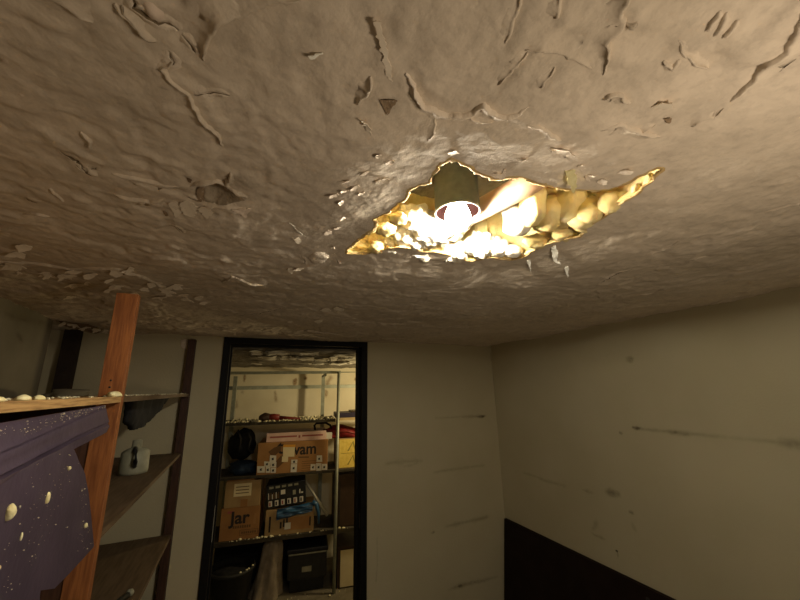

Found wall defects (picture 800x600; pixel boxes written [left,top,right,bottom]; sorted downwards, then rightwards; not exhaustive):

spalling [111,173,251,233]
peeling [329,171,368,206]
peeling [527,125,607,194]
peeling [551,245,569,276]